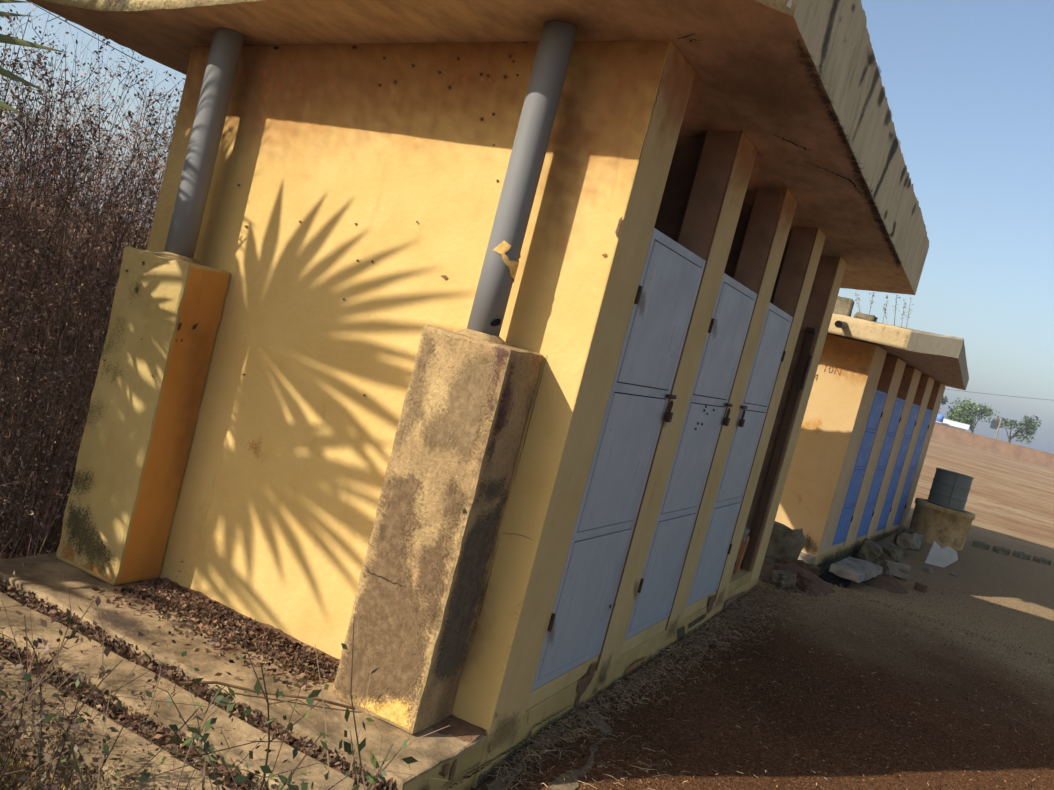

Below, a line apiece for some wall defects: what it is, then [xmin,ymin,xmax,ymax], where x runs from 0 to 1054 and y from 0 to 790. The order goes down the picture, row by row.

leakage [793,0,901,267]
leakage [65,471,114,569]
leakage [433,475,508,682]